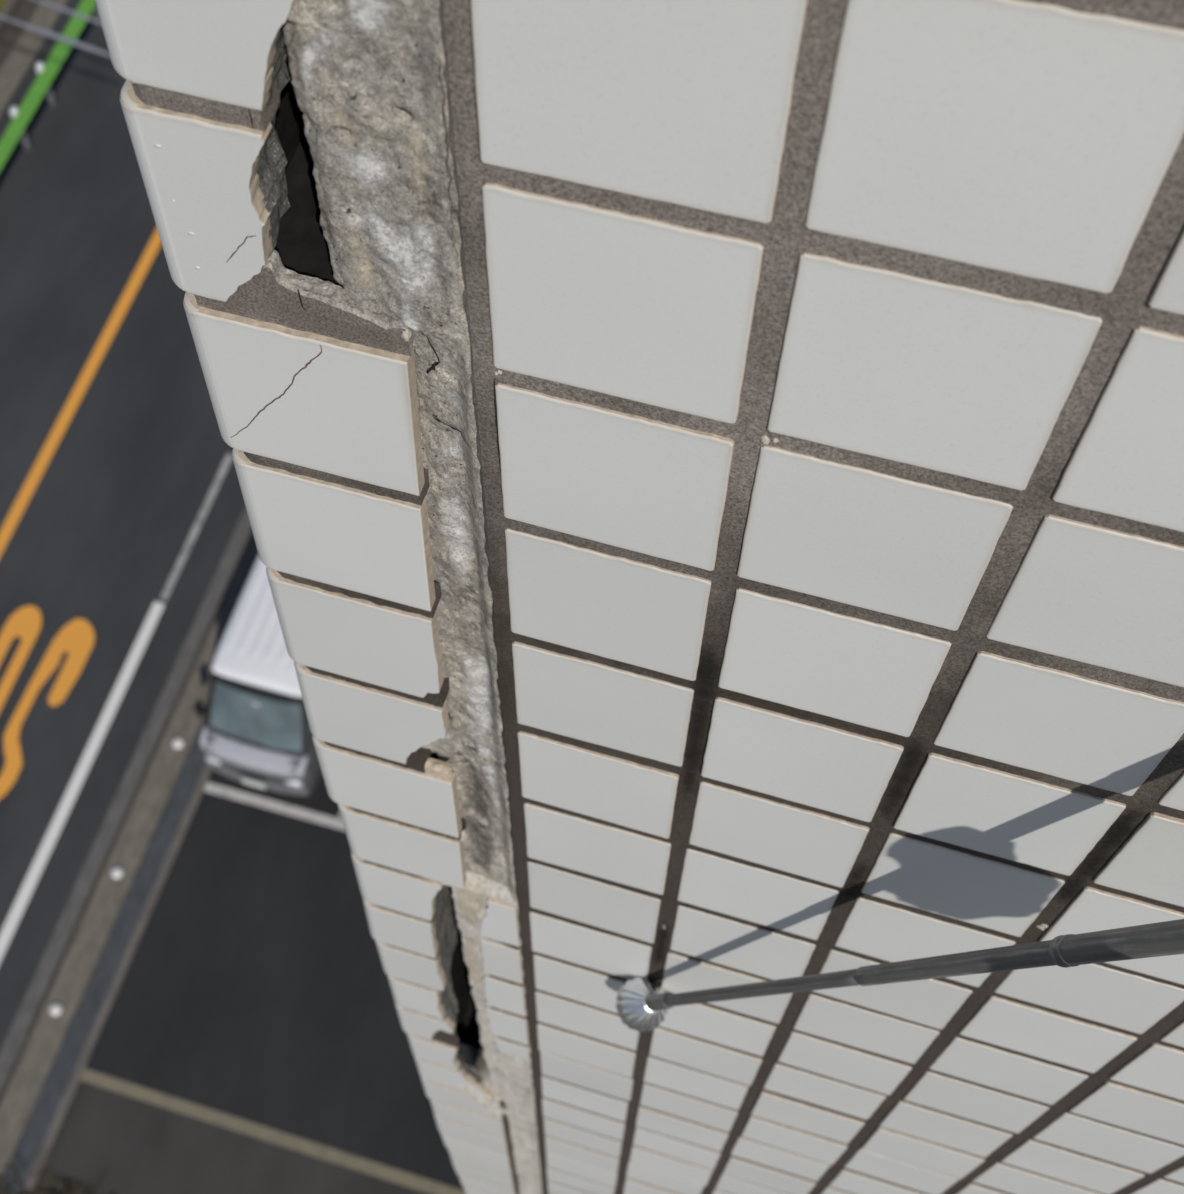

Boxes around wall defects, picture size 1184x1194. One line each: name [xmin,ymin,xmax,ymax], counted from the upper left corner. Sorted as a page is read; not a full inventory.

crack [231,345,322,438]
spalling [194,0,542,1194]